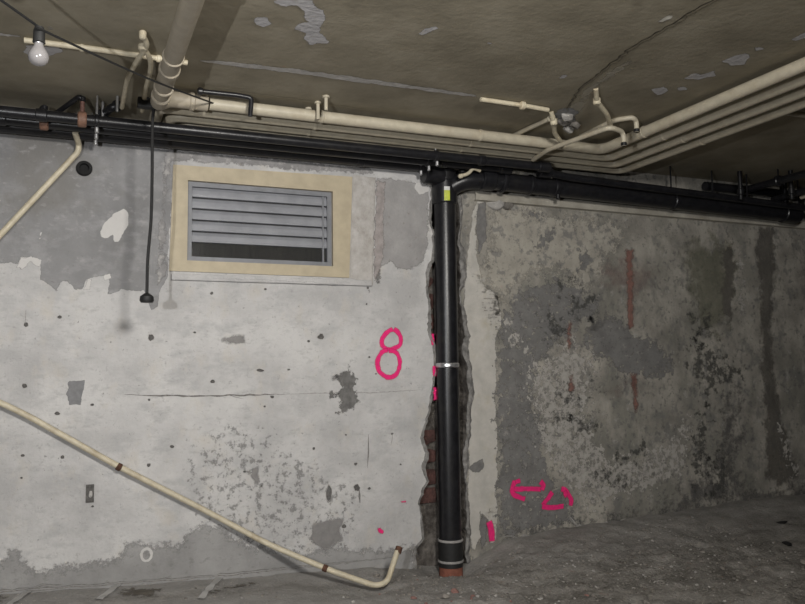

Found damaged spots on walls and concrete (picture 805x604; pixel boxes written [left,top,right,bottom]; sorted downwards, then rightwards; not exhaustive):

peeling [254,17,271,27]
peeling [274,0,329,45]
corrosion [625,250,634,329]
peeling [0,133,436,599]
crack [125,390,415,399]
peeling [457,193,702,564]
damp [652,227,805,515]